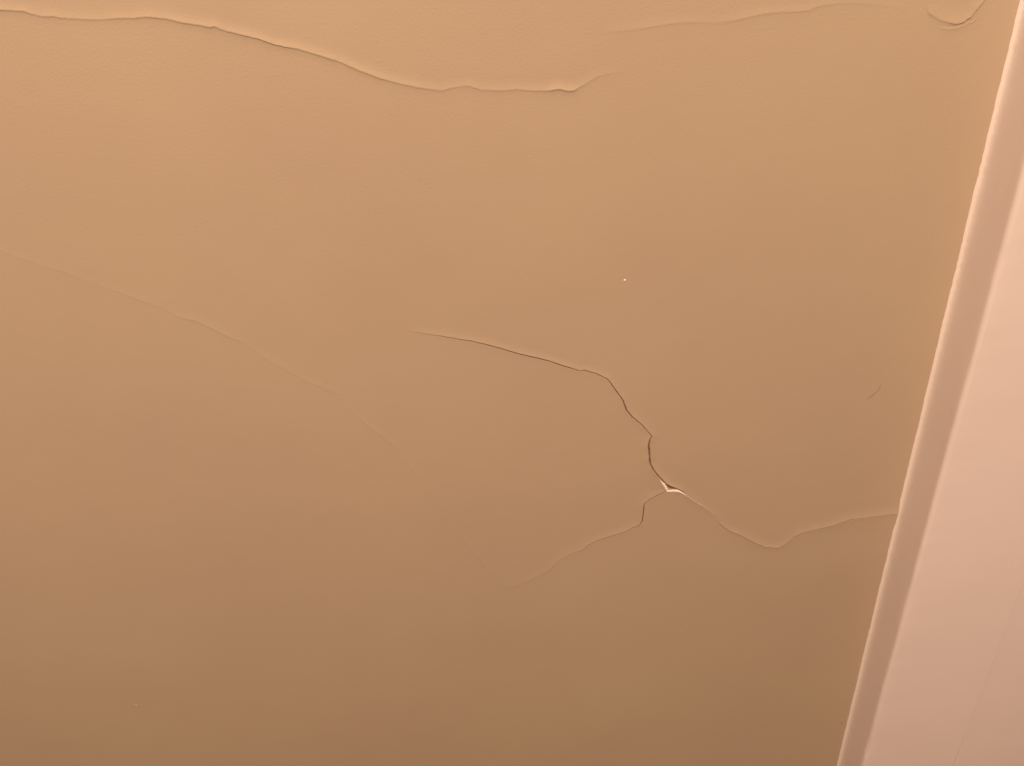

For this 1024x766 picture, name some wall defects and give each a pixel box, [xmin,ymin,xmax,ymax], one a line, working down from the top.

crack [403,324,900,596]